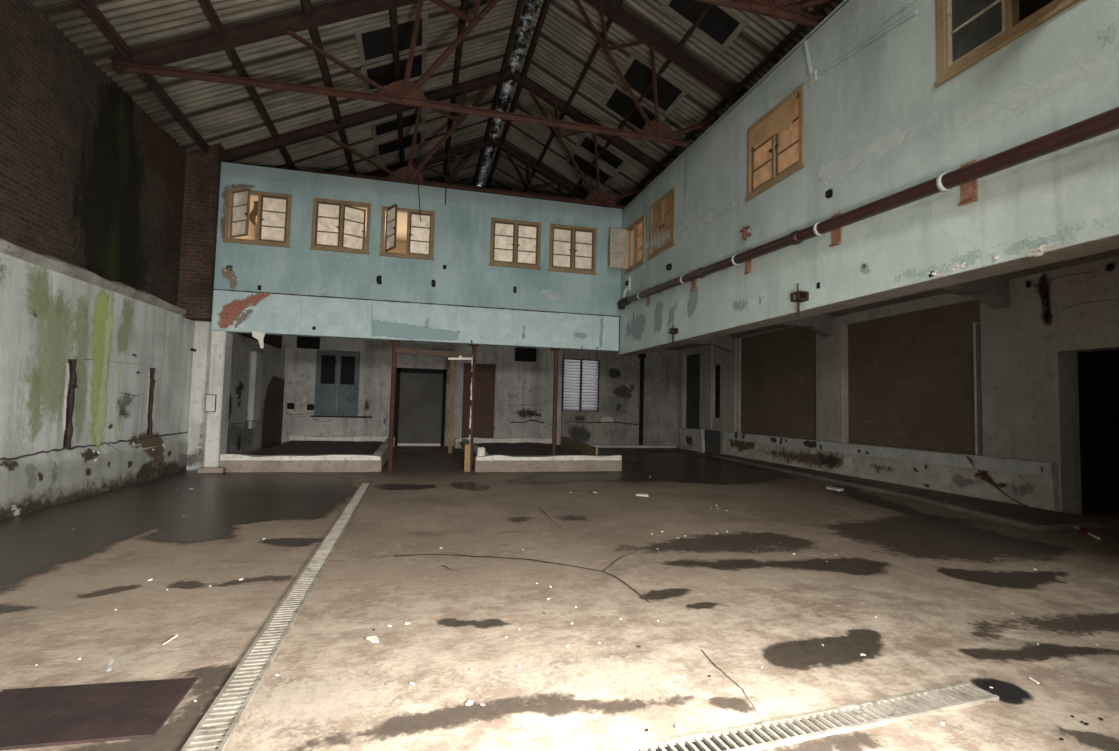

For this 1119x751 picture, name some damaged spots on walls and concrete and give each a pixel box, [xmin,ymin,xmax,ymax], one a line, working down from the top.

damp [73,83,148,446]
peeling [217,265,269,349]
damp [1025,270,1100,326]
damp [30,379,40,438]
mould [609,368,634,411]
spalling [0,459,18,471]
spalling [80,447,110,476]
spalling [128,432,178,481]
spalling [0,502,52,519]
damp [615,486,1075,589]
crack [394,550,650,603]
crack [701,650,759,715]